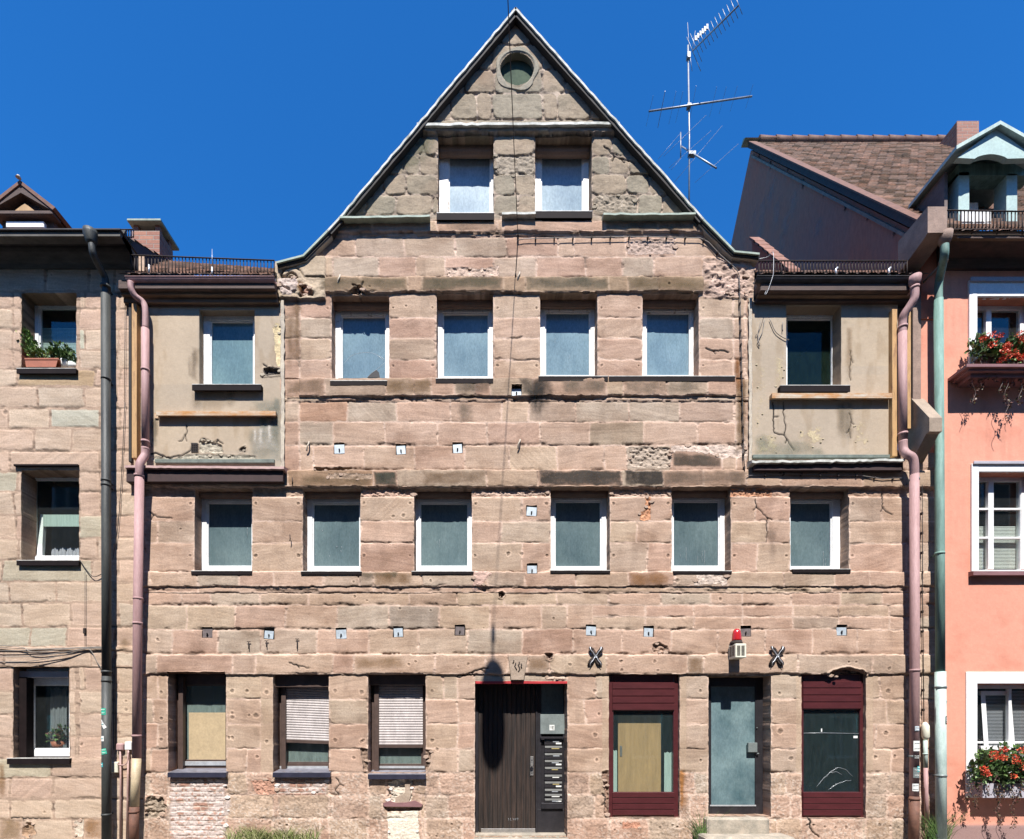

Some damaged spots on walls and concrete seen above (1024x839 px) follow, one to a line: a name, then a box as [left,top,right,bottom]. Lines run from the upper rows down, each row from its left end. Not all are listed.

spalling [277,276,313,296]
spalling [710,274,750,296]
crack [772,402,792,448]
flaking render [150,439,257,461]
spalling [628,436,777,468]